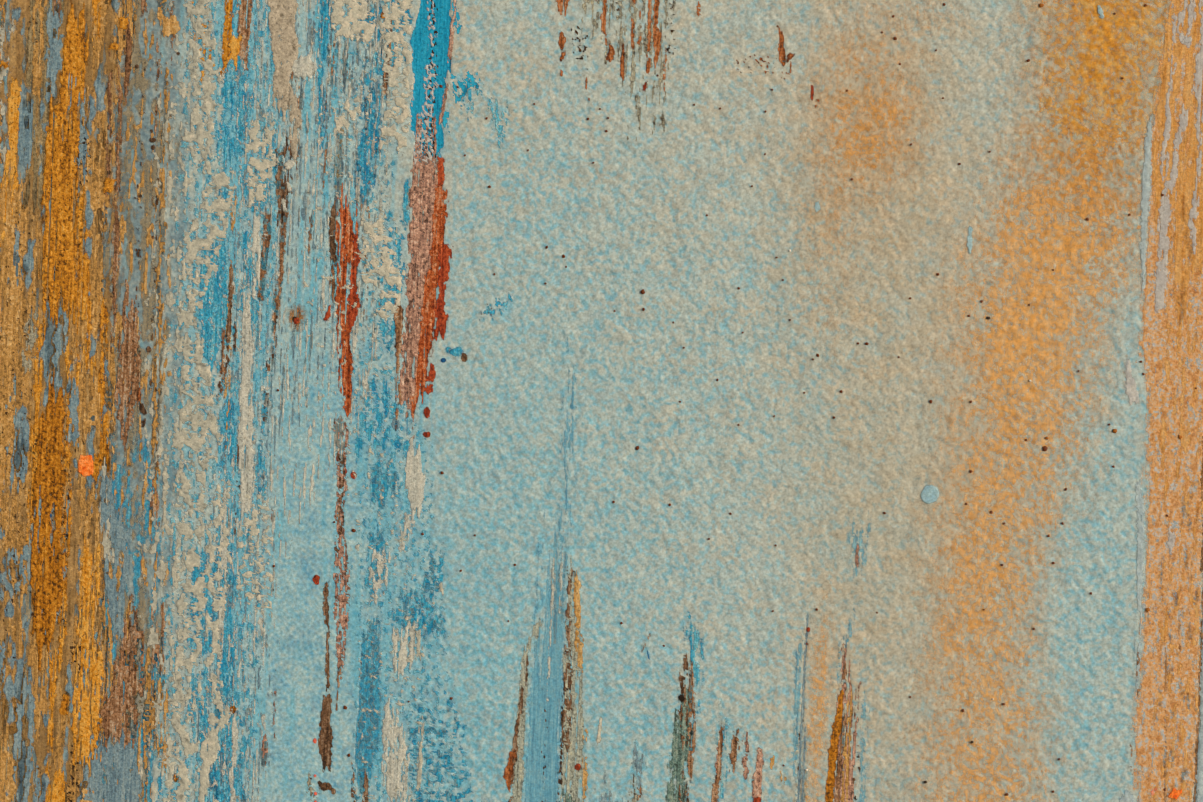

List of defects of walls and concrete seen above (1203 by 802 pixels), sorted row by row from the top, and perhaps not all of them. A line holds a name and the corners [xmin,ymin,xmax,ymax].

peeling [94,0,512,802]
peeling [503,749,517,792]